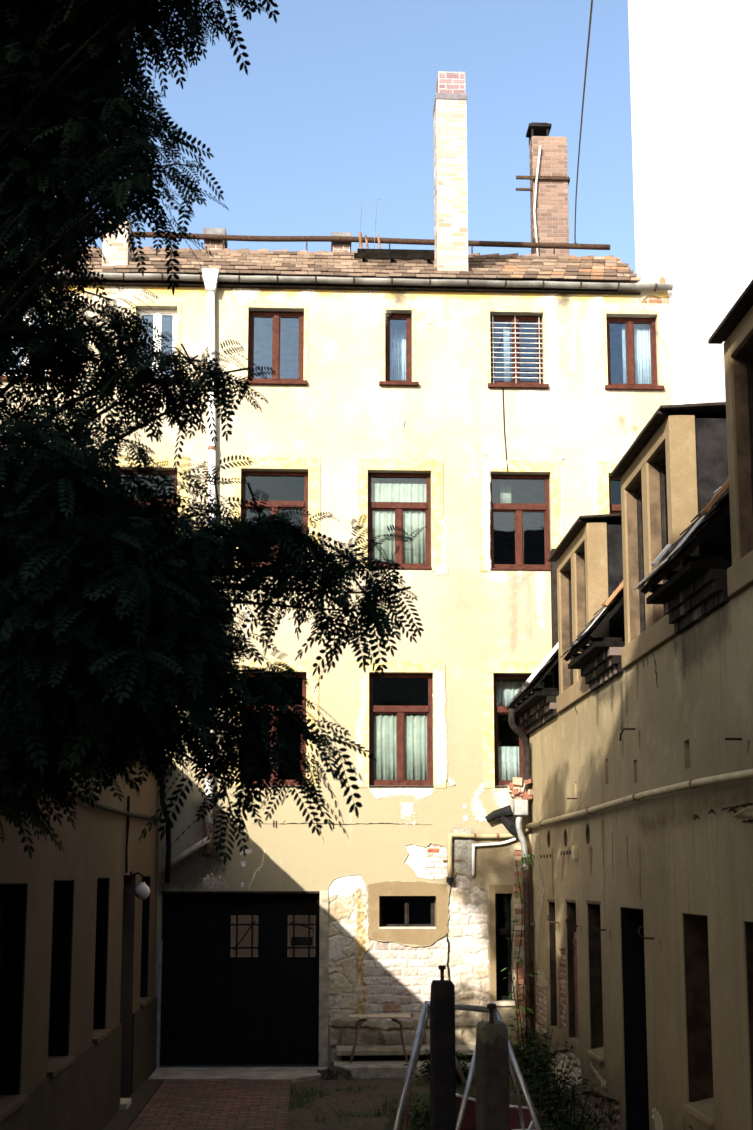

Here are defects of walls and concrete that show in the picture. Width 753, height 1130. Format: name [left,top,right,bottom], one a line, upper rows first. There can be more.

flaking render [482,460,522,583]
flaking render [536,573,545,627]
flaking render [356,669,455,825]
crack [274,820,432,828]
flaking render [463,783,510,822]
crack [248,849,265,890]
flaking render [326,842,491,1064]